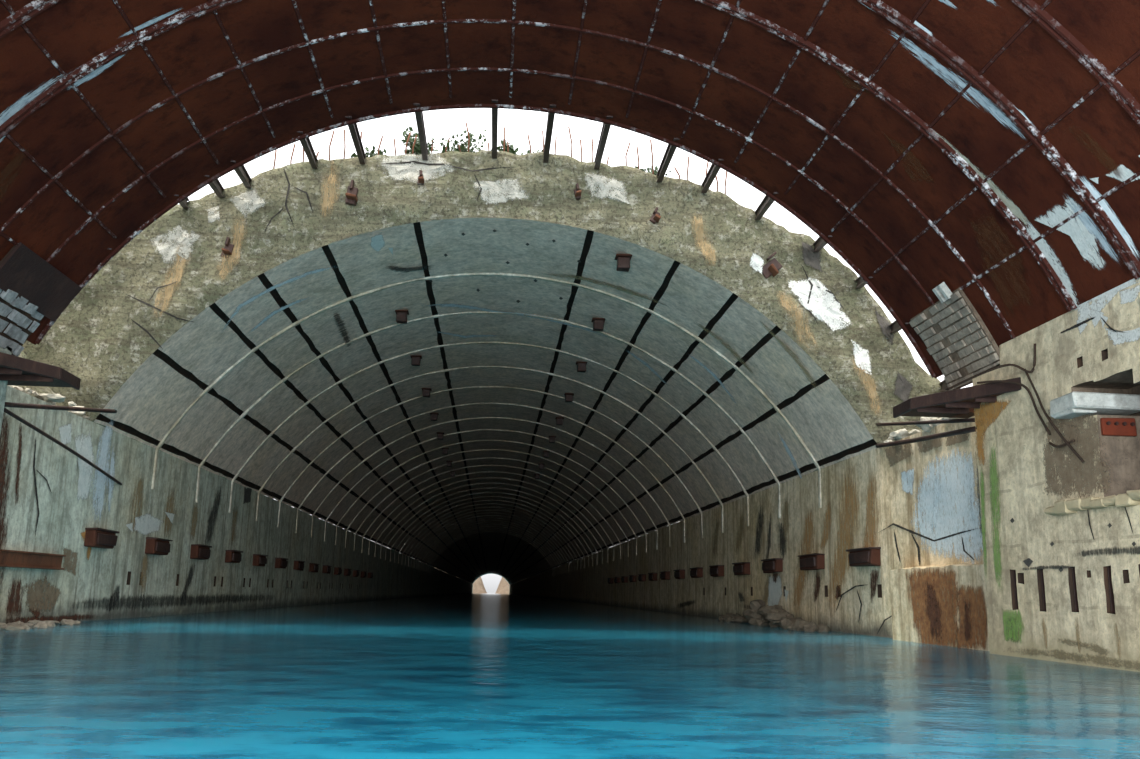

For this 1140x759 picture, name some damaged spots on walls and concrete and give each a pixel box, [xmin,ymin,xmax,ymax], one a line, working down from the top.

peeling [0,55,124,142]
peeling [892,32,1032,138]
peeling [382,153,453,180]
peeling [473,179,529,204]
rust [550,274,668,307]
spalling [750,254,764,274]
spalling [788,242,852,331]
peeling [934,131,1140,345]
rust [763,325,817,389]
spalling [851,340,871,375]
peeling [885,433,983,563]
rust [905,568,987,650]